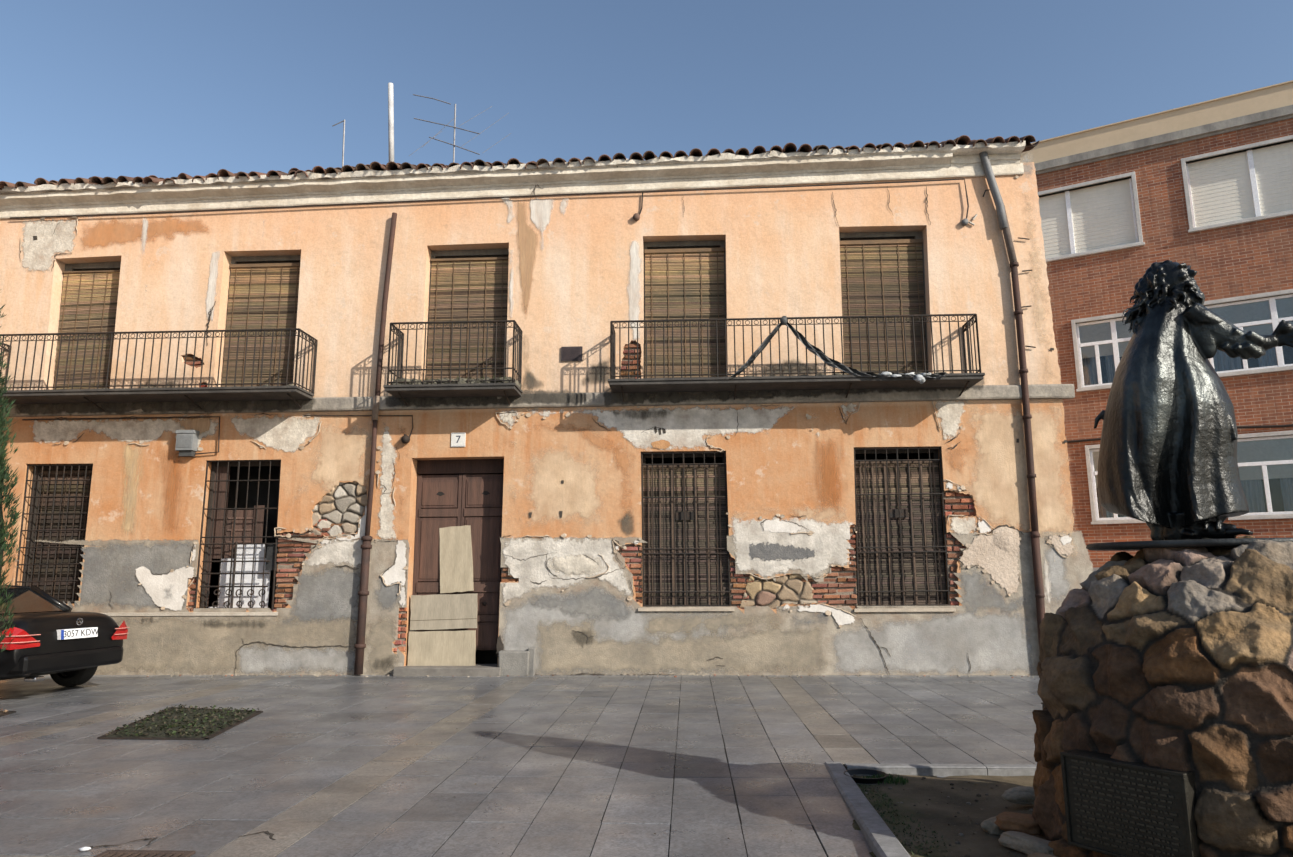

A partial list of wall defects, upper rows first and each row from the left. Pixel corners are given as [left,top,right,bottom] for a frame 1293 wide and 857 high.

flaking render [19,217,78,272]
water stain [502,198,568,317]
flaking render [29,413,322,452]
flaking render [495,404,819,452]
flaking render [135,542,199,611]
flaking render [270,426,410,655]
flaking render [501,511,643,606]
flaking render [726,512,857,628]
flaking render [943,479,1022,606]